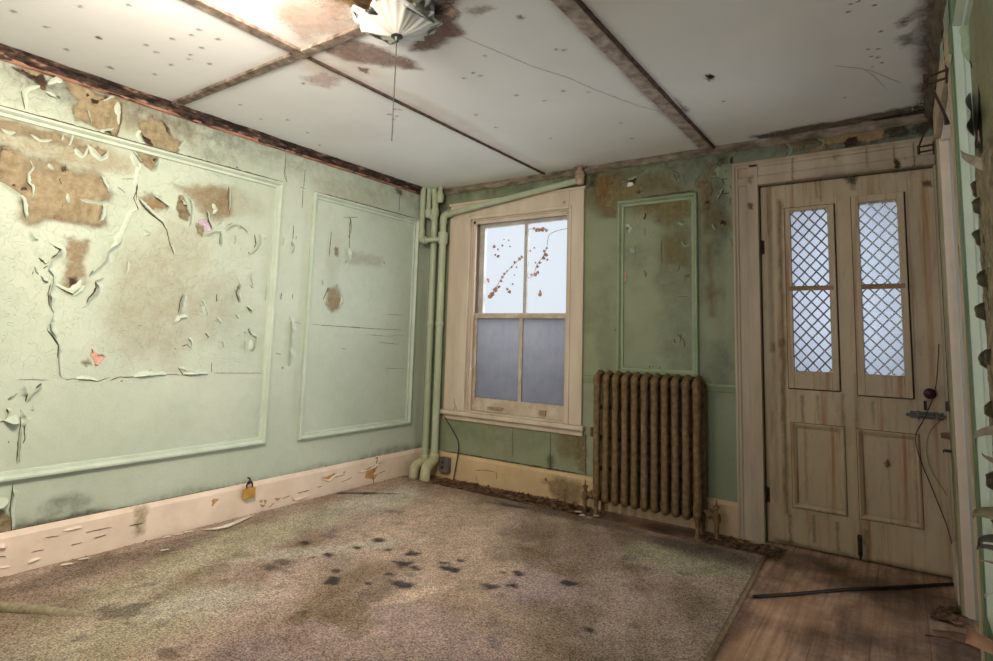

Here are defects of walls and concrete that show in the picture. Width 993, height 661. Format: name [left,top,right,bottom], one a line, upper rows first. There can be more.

water stain [274,0,463,73]
peeling [14,67,122,136]
water stain [755,0,934,156]
peeling [130,115,185,172]
peeling [0,118,125,379]
peeling [142,176,266,255]
water stain [591,175,697,223]
peeling [322,279,343,311]
peeling [970,130,993,490]
peeling [320,457,384,487]
peeling [0,485,18,568]
peeling [972,507,993,564]